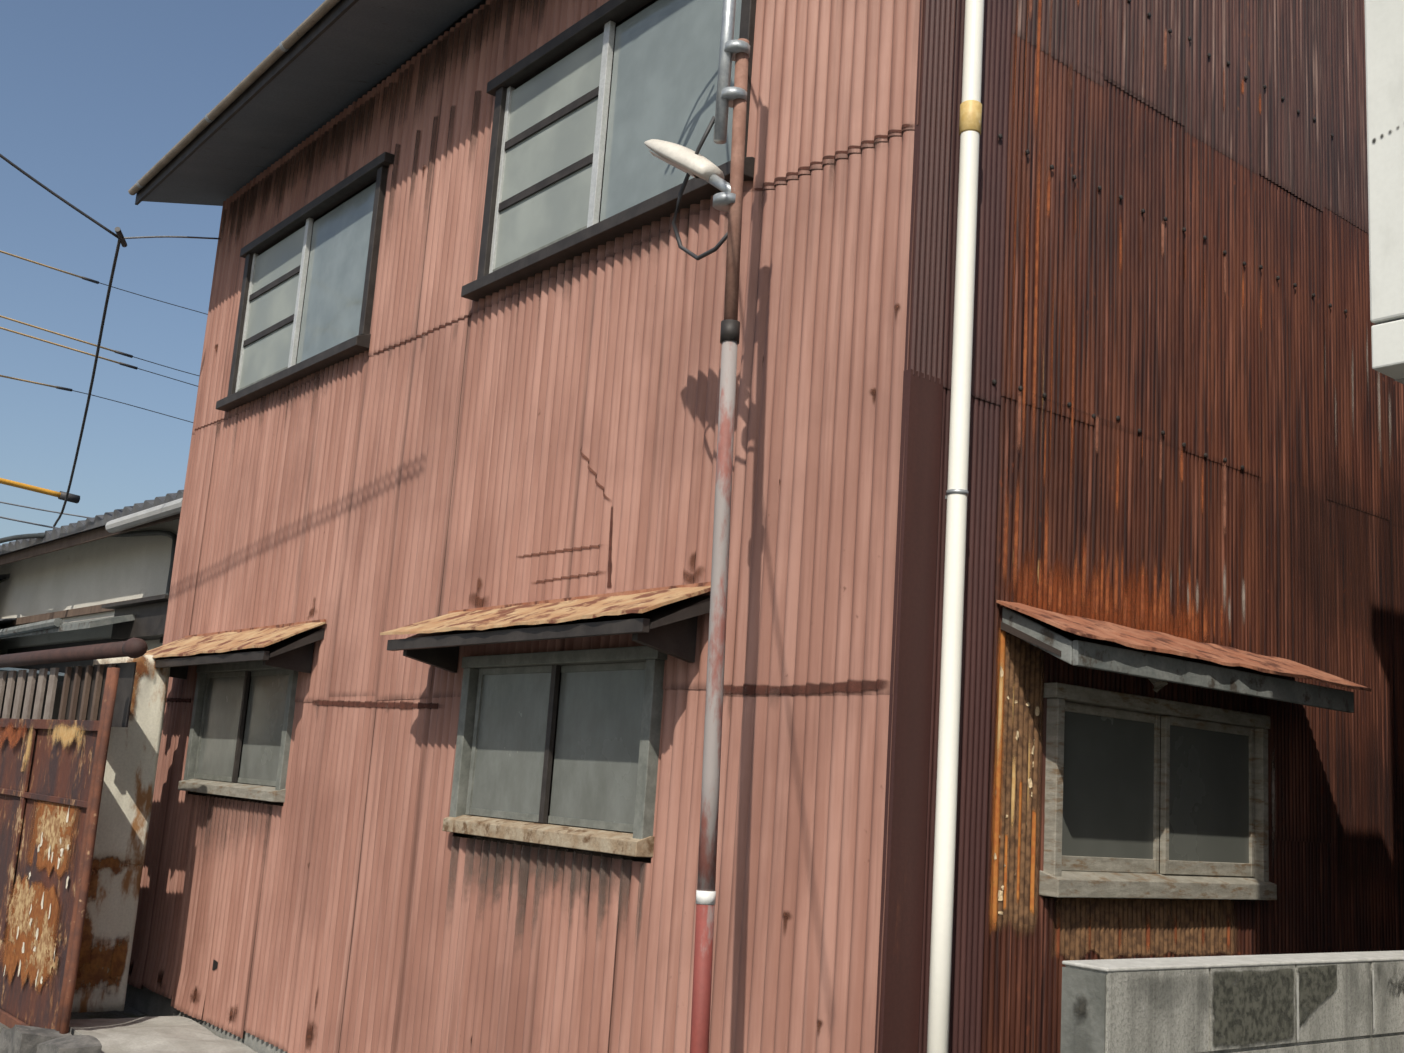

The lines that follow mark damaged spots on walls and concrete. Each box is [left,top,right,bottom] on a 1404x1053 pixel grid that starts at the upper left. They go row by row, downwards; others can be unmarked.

corrosion [1014,0,1041,130]
corrosion [1011,157,1099,480]
corrosion [1224,256,1262,327]
corrosion [1223,465,1242,532]
corrosion [472,579,485,608]
corrosion [1003,494,1231,643]
corrosion [107,655,163,717]
corrosion [75,856,134,994]